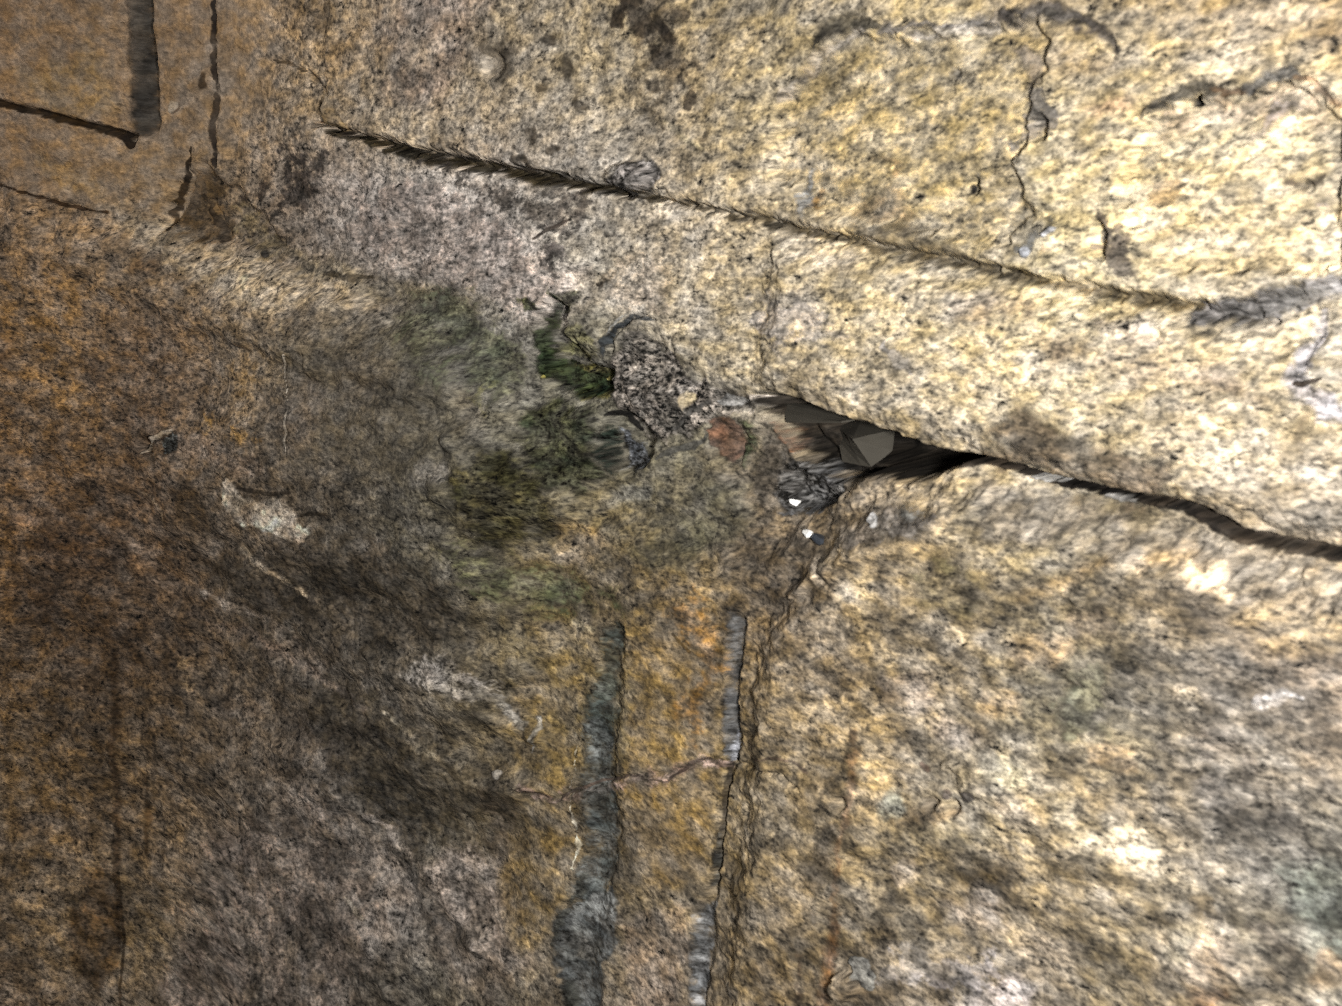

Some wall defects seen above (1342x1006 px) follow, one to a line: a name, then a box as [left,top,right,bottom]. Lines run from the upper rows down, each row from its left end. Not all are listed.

crack [198,0,220,172]
crack [532,218,571,240]
crack [959,454,1342,562]
water stain [200,450,625,1006]
crack [515,757,808,803]
water stain [688,609,747,1006]
water stain [159,806,372,1006]